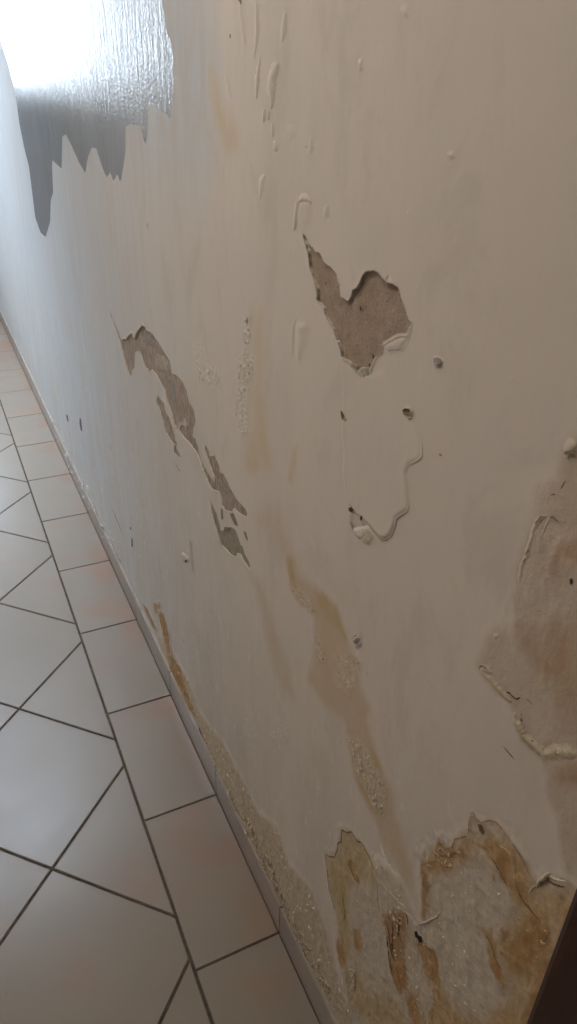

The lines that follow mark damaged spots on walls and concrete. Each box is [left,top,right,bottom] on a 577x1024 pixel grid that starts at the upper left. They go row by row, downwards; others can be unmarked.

peeling [302,230,412,378]
peeling [110,311,251,568]
leakage [232,282,577,1024]